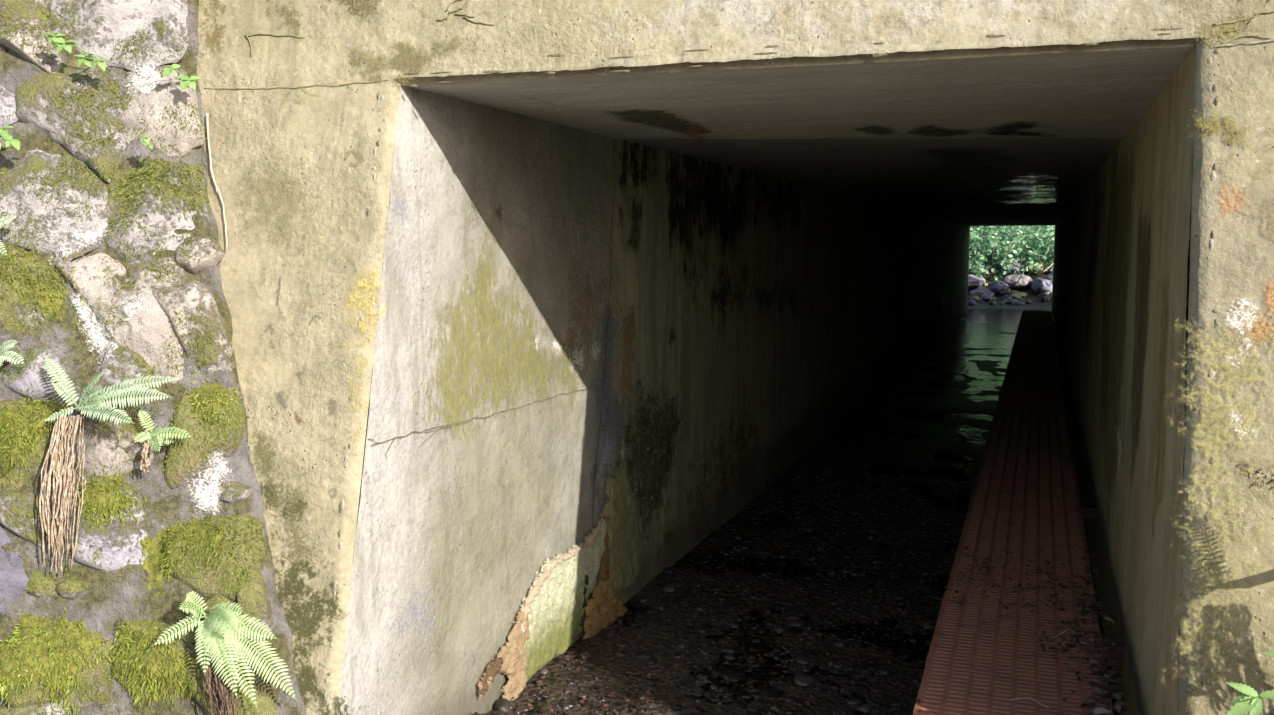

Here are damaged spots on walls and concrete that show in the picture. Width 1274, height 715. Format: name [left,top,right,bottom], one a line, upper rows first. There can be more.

crack [369,138,615,529]
leakage [618,140,801,319]
corrosion [1235,281,1274,345]
peeling [467,515,607,715]